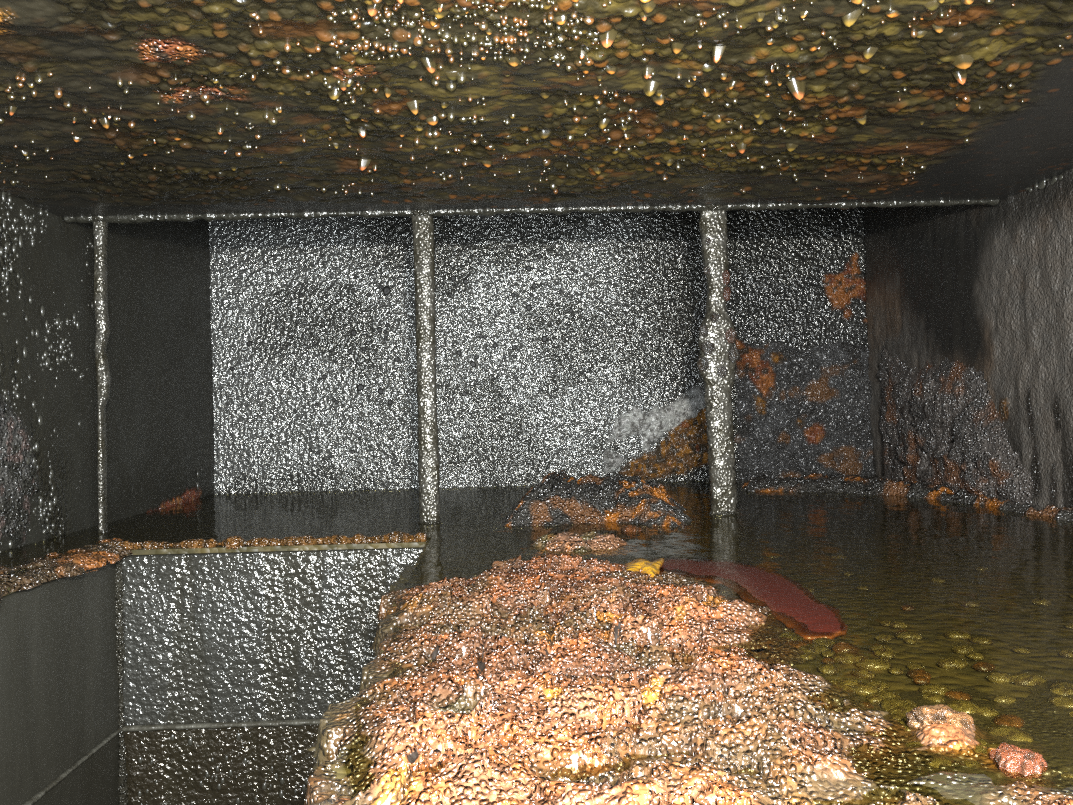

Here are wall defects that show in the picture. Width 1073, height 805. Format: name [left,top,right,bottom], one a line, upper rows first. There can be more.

corrosion [141,40,203,62]
corrosion [160,86,243,101]
corrosion [823,253,866,319]
corrosion [736,341,784,414]
corrosion [501,408,709,559]
leakage [1026,390,1056,505]
corrosion [0,531,427,603]